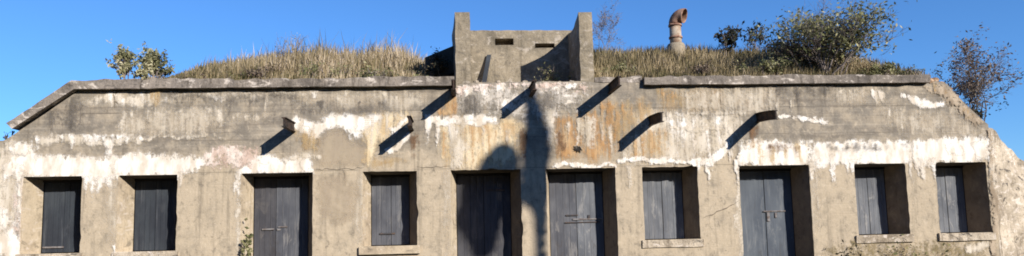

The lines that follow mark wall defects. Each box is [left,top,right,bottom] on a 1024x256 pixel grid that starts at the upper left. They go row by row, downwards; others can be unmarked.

peeling [204,145,259,170]
corrosion [554,100,667,161]